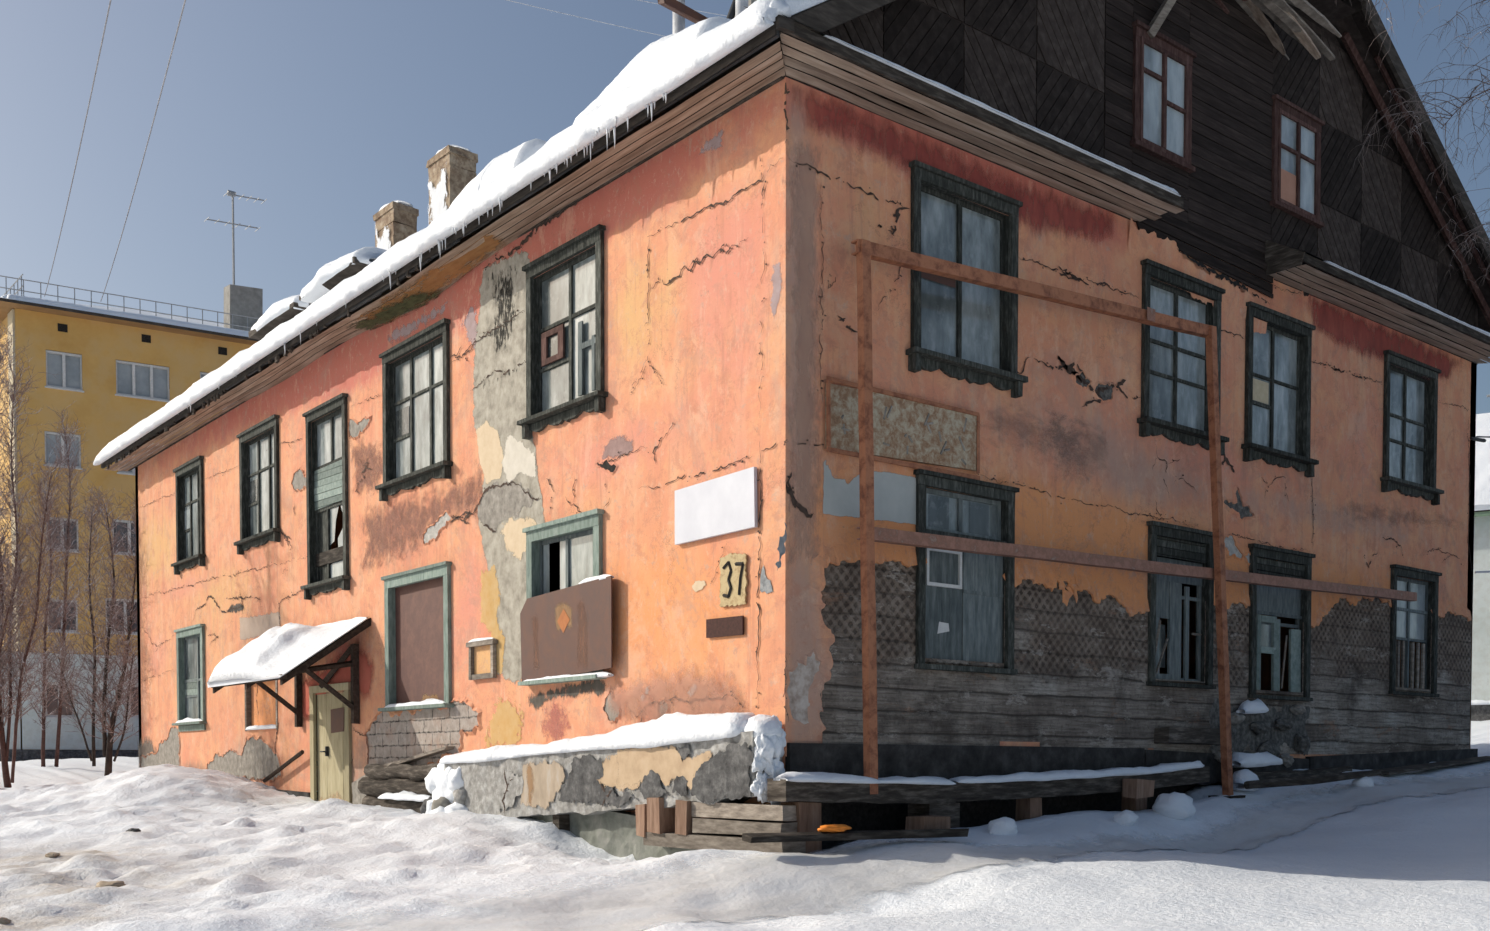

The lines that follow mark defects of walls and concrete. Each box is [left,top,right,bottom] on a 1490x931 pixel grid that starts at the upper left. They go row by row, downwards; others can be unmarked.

damp [806,94,1112,237]
crack [450,83,909,721]
crack [1018,355,1140,407]
damp [352,234,605,740]
flaking render [476,420,537,560]
peeling [823,460,916,525]
crack [978,446,1316,552]
crack [144,505,304,681]
flaking render [784,543,1472,756]
flaking render [207,735,283,783]
flaking render [364,697,525,766]
spalling [493,742,753,812]